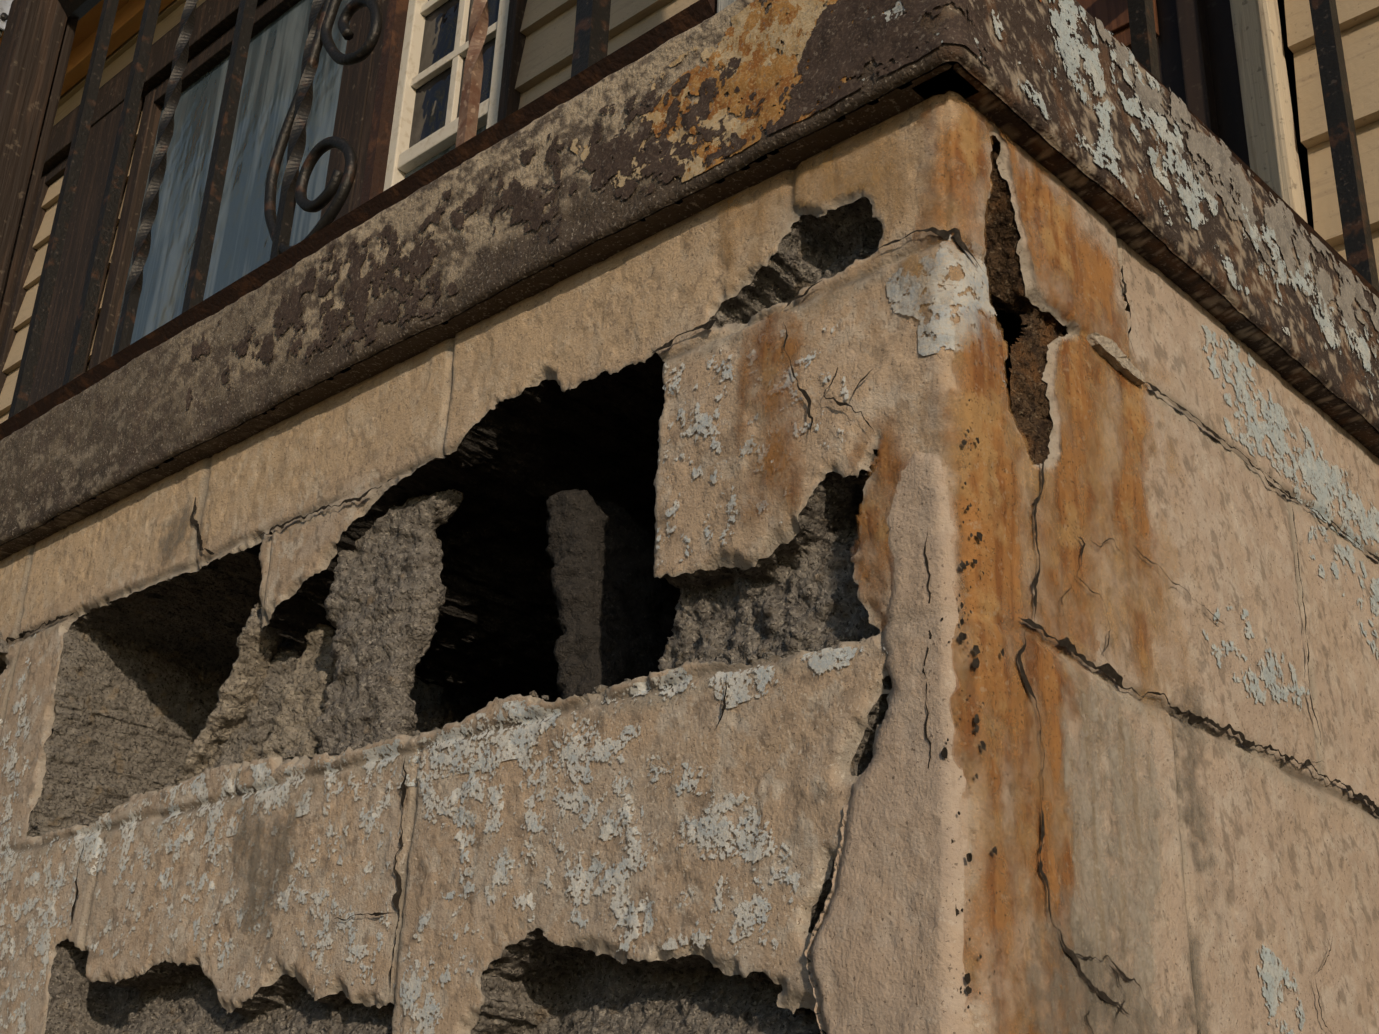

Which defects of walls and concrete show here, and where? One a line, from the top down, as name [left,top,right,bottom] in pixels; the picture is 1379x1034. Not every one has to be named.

peeling [191,0,1007,394]
corrosion [649,0,858,174]
peeling [1018,61,1049,119]
damp [234,813,296,930]
spalling [0,349,888,1034]
corrosion [933,103,1151,963]
crack [1018,246,1379,1034]